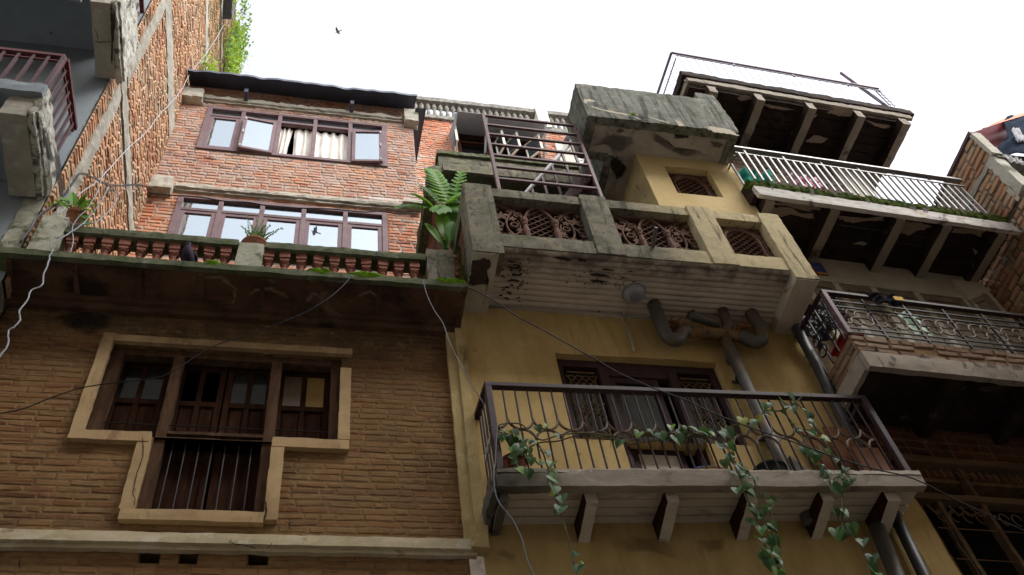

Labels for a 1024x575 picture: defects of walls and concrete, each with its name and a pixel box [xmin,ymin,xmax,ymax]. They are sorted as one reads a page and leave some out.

spalling [469,258,530,305]
crack [132,437,144,506]